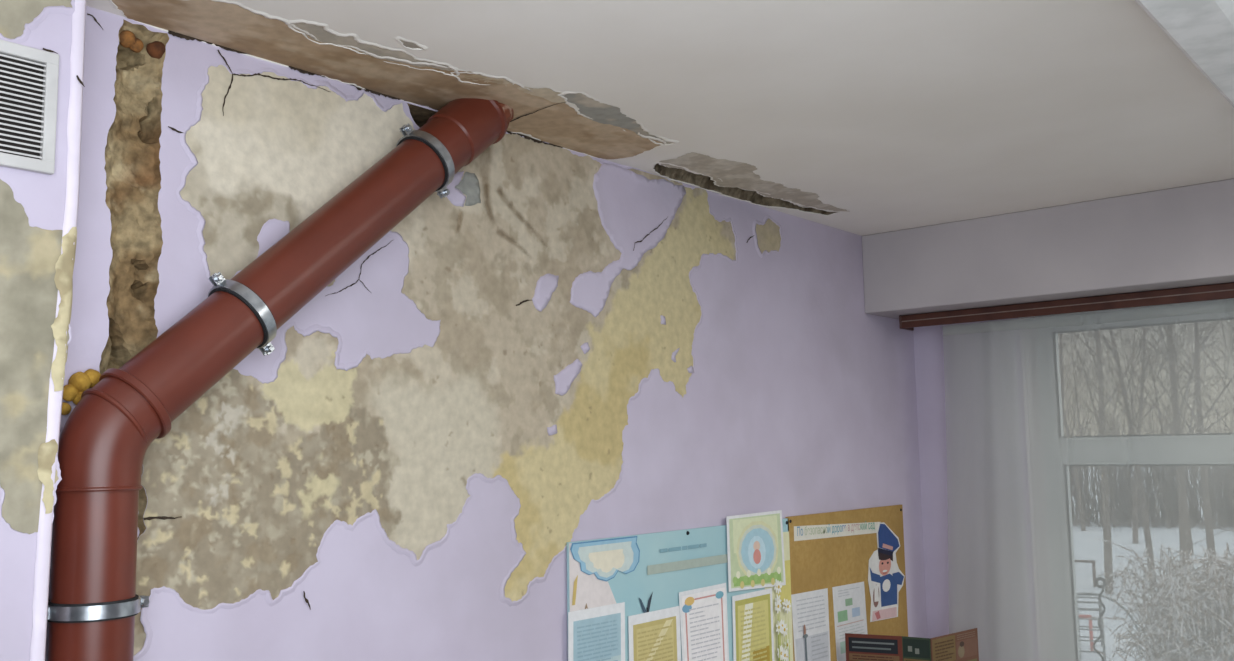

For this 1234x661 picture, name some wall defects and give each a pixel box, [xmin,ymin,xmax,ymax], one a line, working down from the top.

crack [168,30,406,116]
crack [506,102,565,148]
peeling [0,175,77,537]
peeling [99,0,850,661]